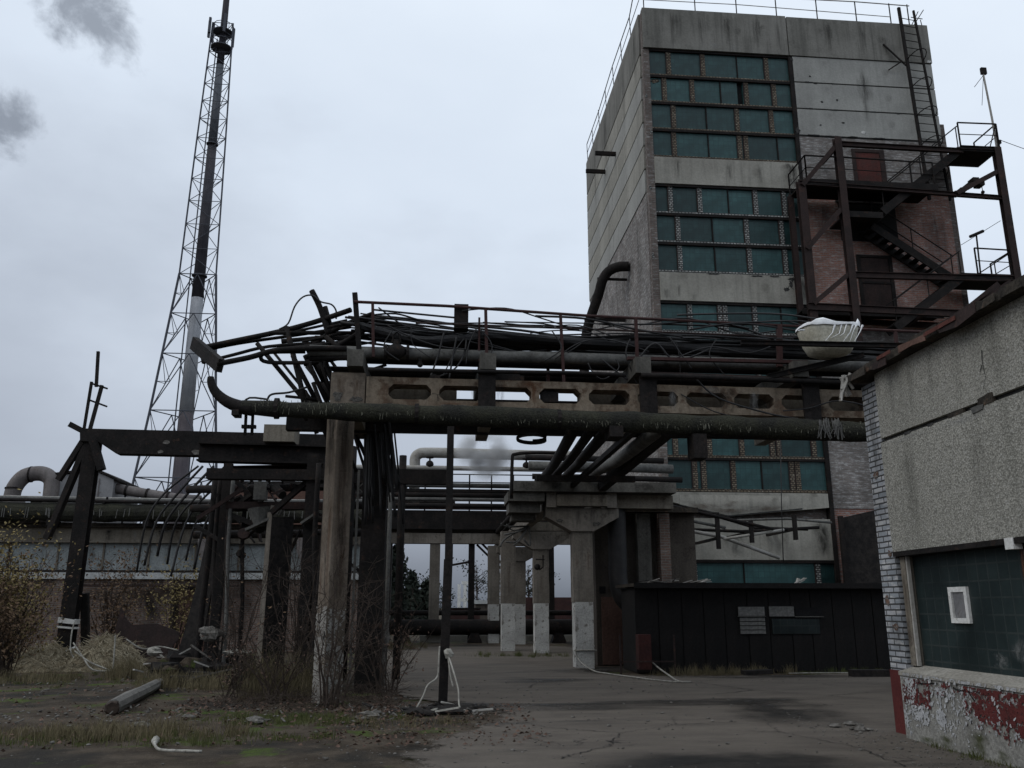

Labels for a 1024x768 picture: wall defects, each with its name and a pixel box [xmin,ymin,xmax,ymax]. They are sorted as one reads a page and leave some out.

peeling [900,673,1024,748]